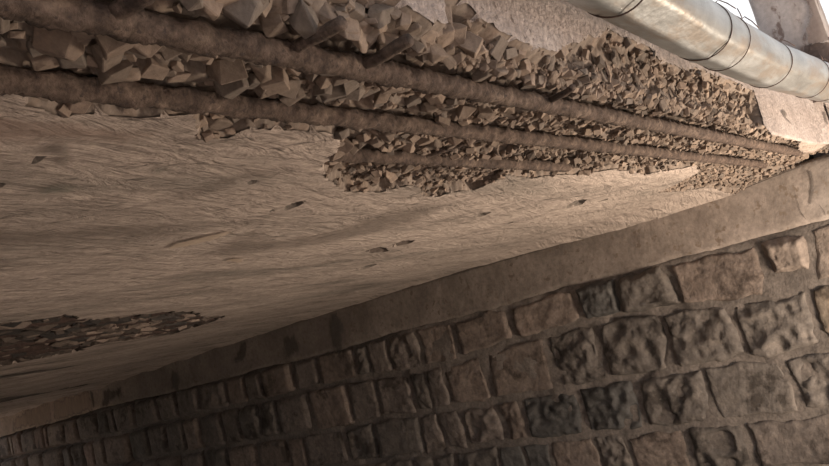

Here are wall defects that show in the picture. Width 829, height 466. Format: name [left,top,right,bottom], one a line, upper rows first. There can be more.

spalling [0,0,829,197]
spalling [0,311,225,366]